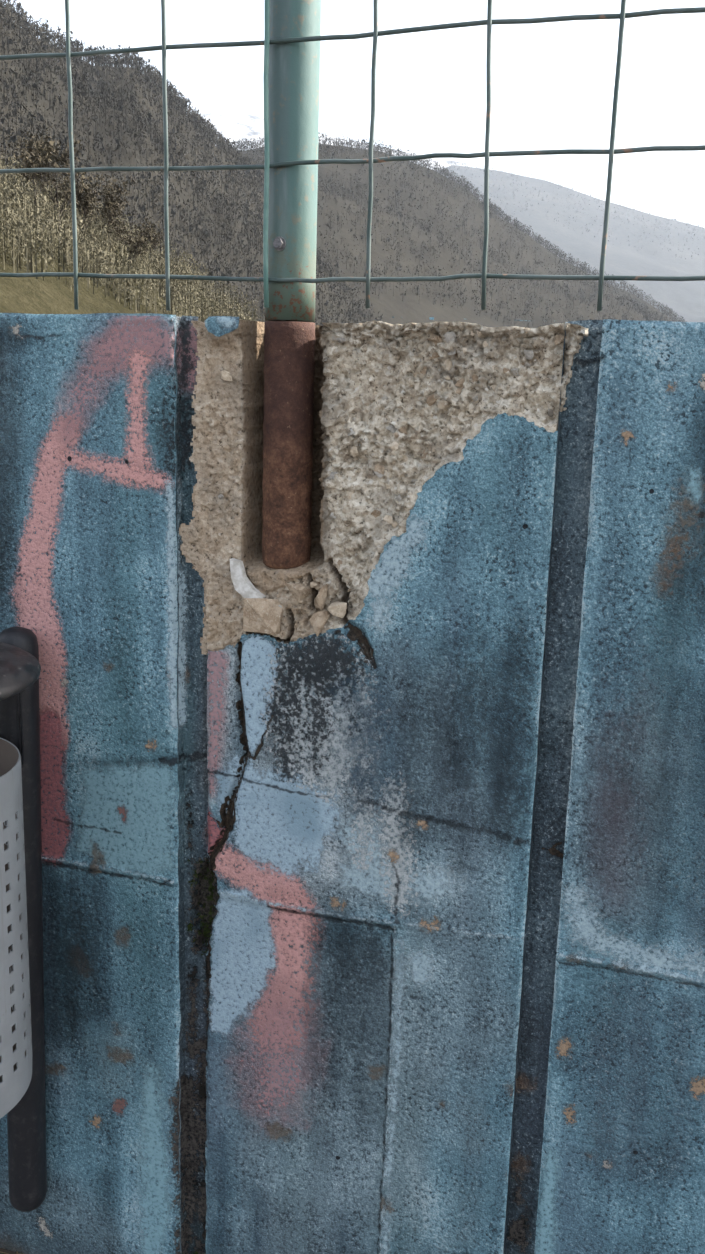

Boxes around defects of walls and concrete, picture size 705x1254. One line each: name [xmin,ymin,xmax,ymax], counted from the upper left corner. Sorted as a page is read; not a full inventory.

crack [158,642,319,874]
leakage [259,629,418,916]
spalling [165,317,589,931]
crack [205,928,213,1066]